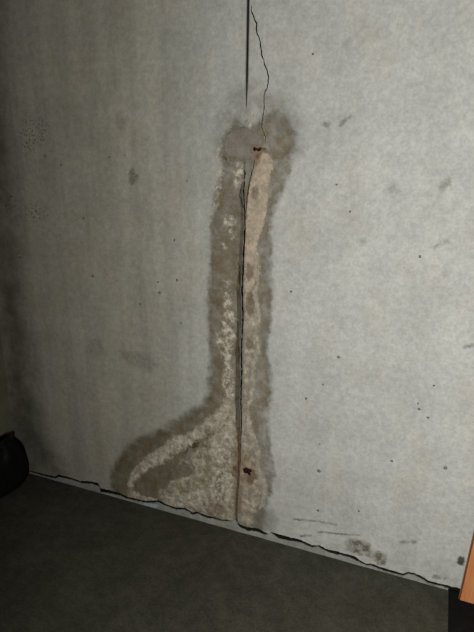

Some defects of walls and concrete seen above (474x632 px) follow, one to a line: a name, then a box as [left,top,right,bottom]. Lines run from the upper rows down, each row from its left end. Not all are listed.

crack [251,5,269,141]
water stain [112,118,293,530]
corrosion [232,431,254,520]
crack [28,159,460,591]